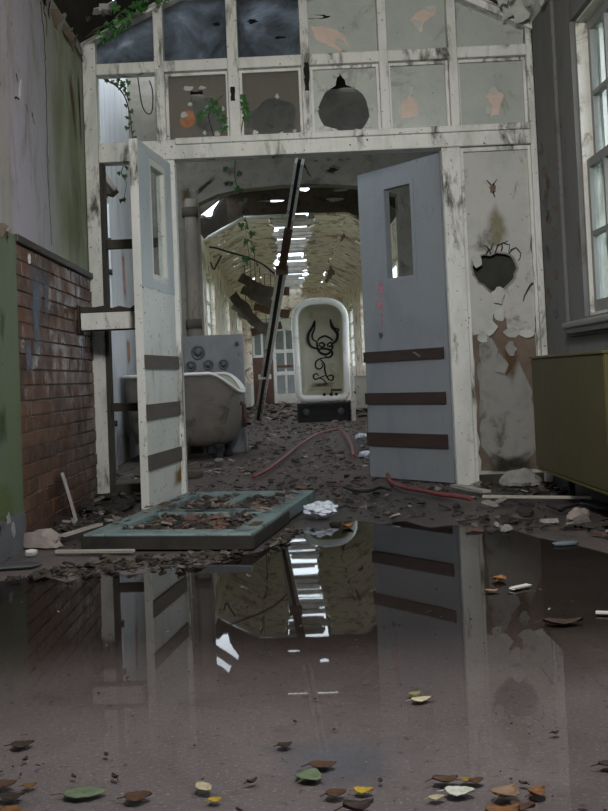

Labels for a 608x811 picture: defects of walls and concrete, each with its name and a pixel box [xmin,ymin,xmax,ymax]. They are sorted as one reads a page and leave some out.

peeling [489,0,544,23]
peeling [470,240,537,471]